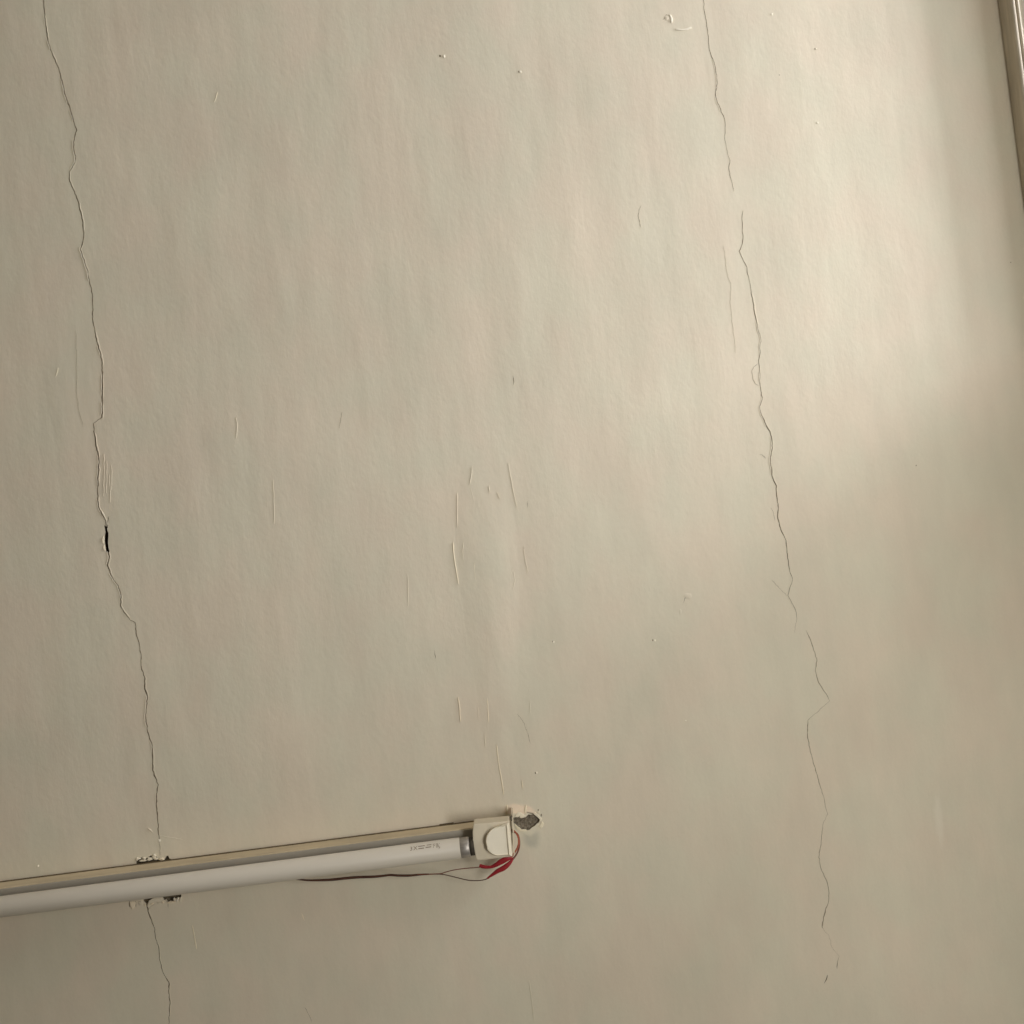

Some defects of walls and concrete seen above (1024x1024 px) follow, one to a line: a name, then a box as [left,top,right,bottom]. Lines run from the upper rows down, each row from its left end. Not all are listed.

crack [703,0,734,189]
crack [43,0,182,845]
crack [723,212,839,983]
flaking render [494,801,544,832]
crack [146,902,171,1016]